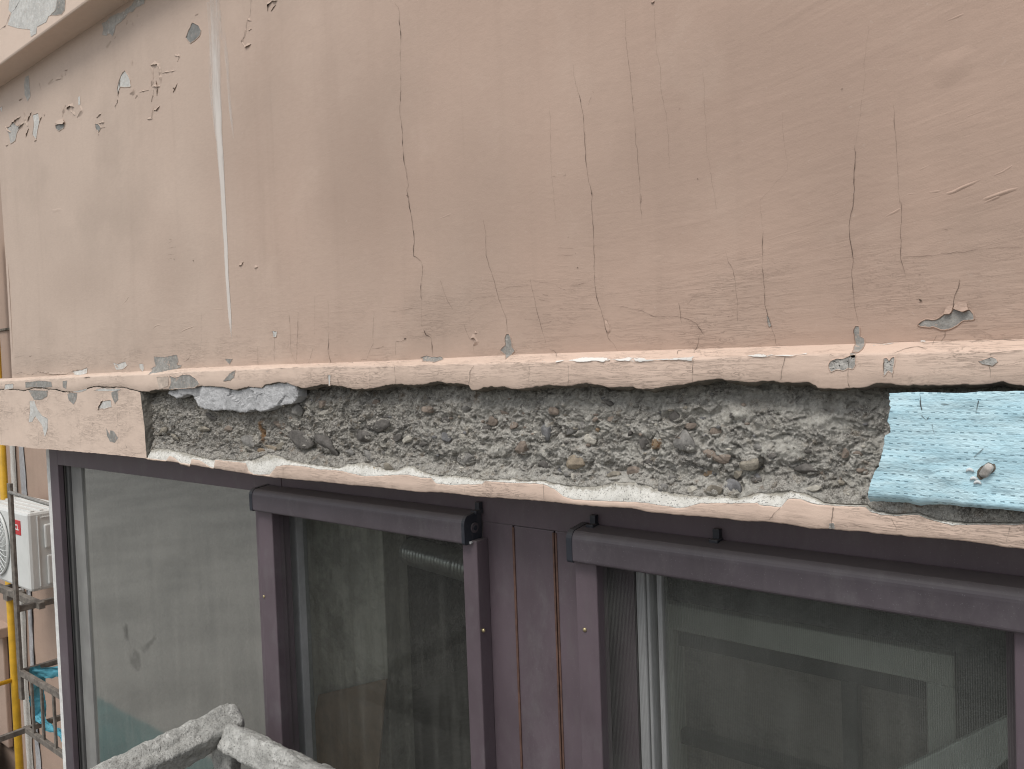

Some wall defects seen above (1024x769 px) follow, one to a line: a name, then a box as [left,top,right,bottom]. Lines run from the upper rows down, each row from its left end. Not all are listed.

peeling [1,0,66,37]
peeling [186,13,202,44]
peeling [5,69,83,145]
peeling [115,61,138,109]
water stain [211,14,231,330]
peeling [917,302,975,342]
peeling [828,326,891,372]
peeling [4,367,121,436]
peeling [106,428,118,443]
spalling [113,355,1024,526]